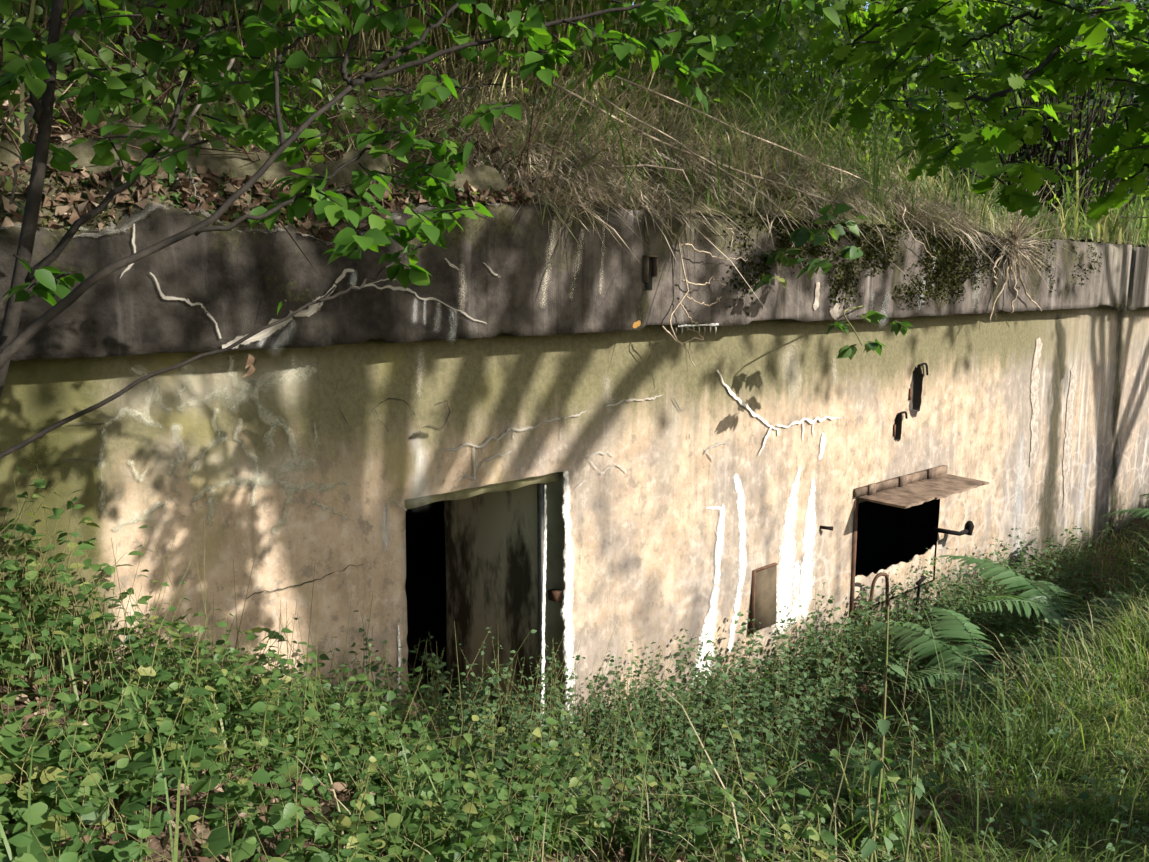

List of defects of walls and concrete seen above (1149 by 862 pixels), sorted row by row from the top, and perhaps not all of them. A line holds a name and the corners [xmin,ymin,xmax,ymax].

crack [120,224,487,349]
crack [445,258,498,276]
crack [318,358,731,482]
crack [575,451,627,489]
crack [717,370,841,455]
crack [247,565,355,599]
efflorescence [693,474,746,688]
efflorescence [776,467,816,633]